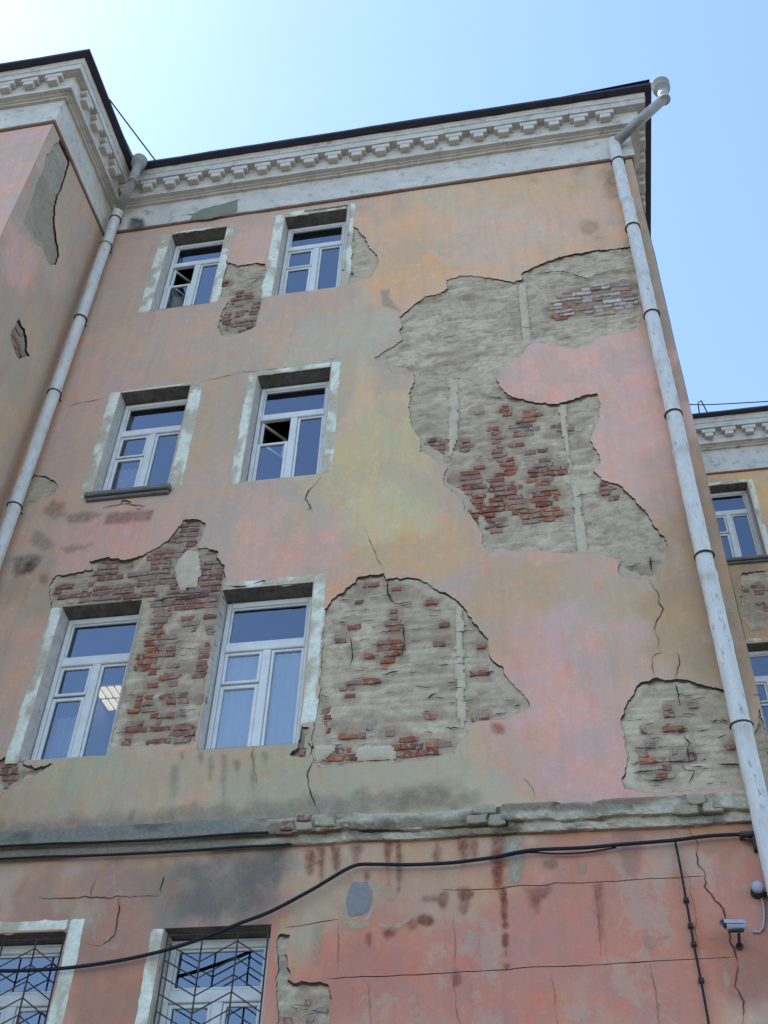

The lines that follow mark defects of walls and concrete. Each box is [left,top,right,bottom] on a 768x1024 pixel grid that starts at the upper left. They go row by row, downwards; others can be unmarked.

spalling [23,139,69,265]
spalling [218,261,266,337]
spalling [375,247,668,580]
spalling [49,519,226,748]
spalling [290,573,530,768]
crack [649,580,680,674]
crack [307,762,320,814]
spalling [621,677,745,794]
crack [41,877,164,946]
spalling [276,926,335,1024]
leakage [504,835,524,882]
crack [688,827,745,1024]